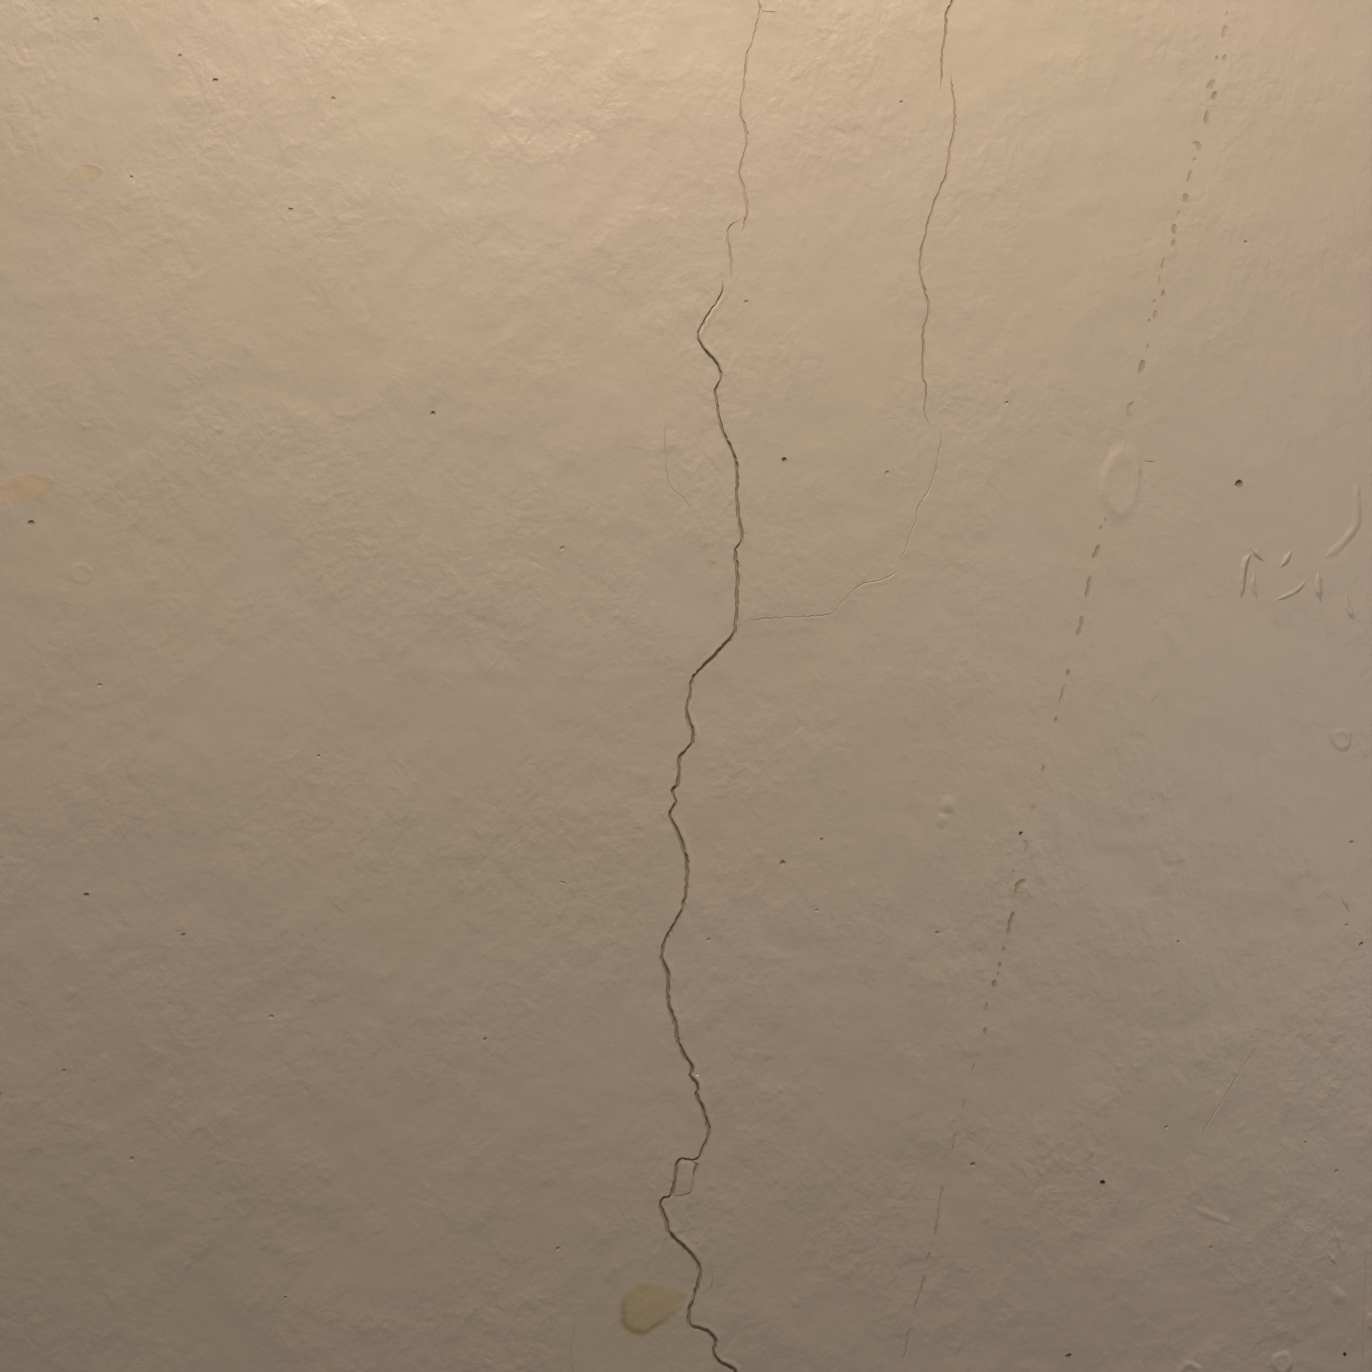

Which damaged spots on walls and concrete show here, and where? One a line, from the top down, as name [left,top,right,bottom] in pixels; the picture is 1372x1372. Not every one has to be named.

leakage [613,1278,694,1339]
crack [658,0,957,1372]